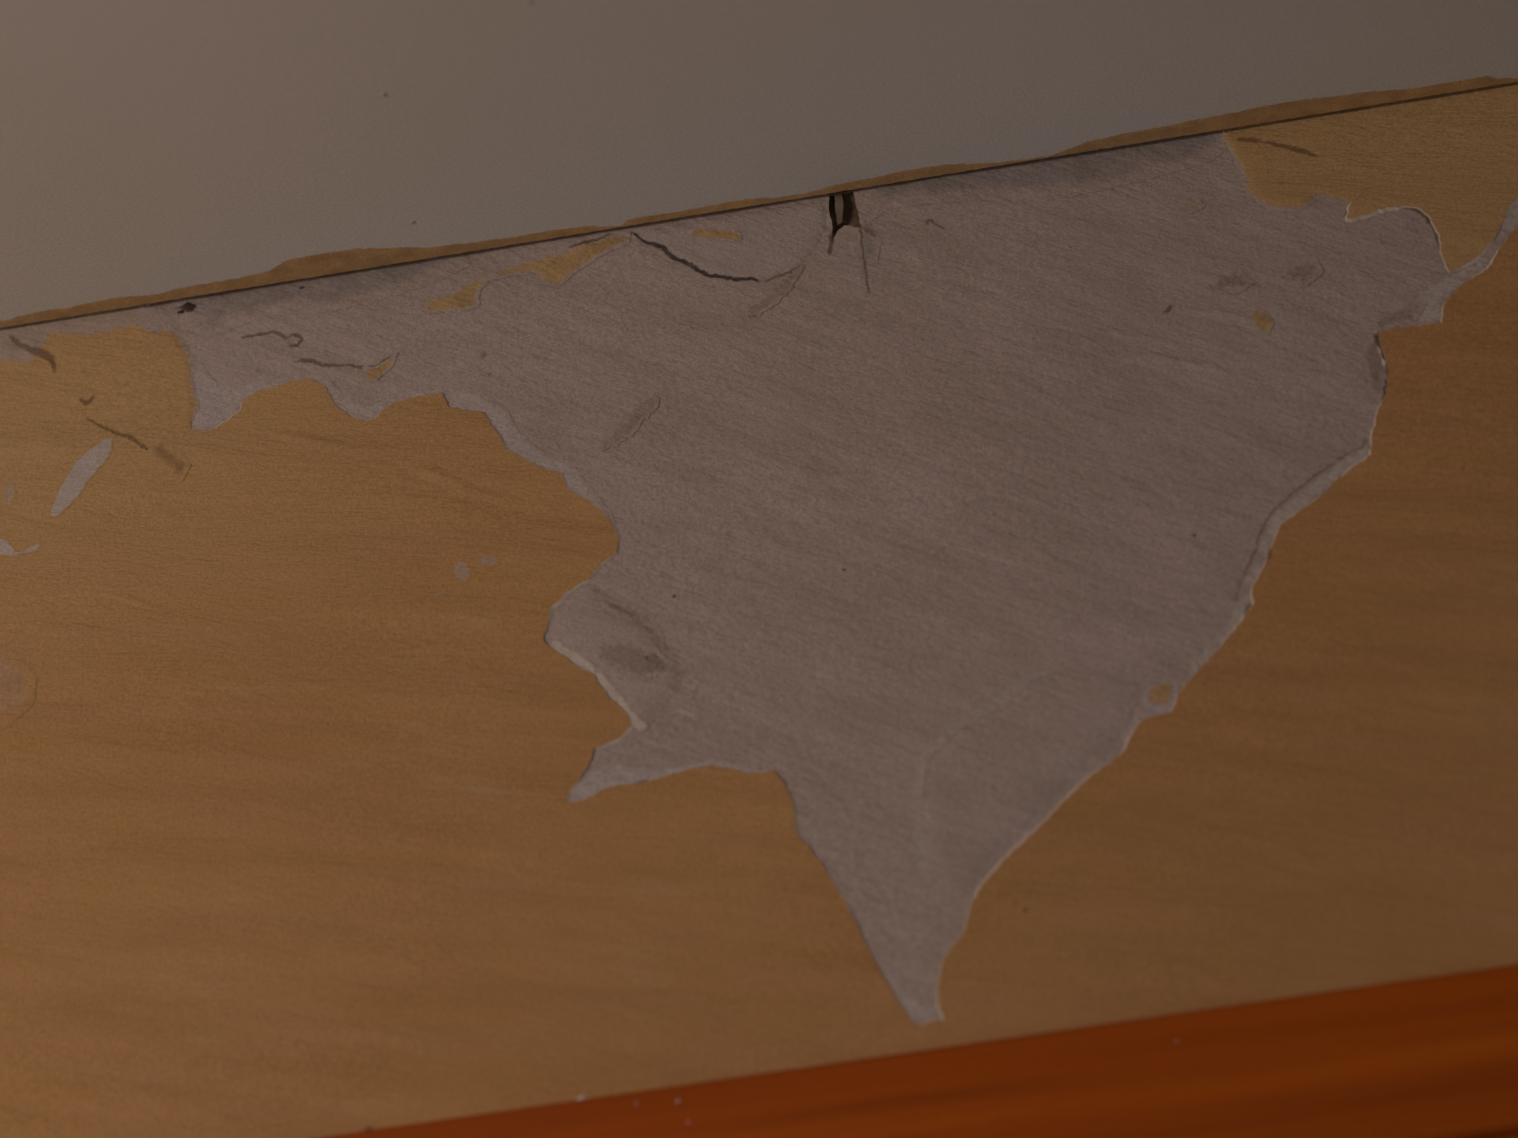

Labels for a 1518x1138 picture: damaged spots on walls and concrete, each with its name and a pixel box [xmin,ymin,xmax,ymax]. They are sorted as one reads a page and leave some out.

crack [0,83,1518,330]
peeling [0,129,1518,1025]